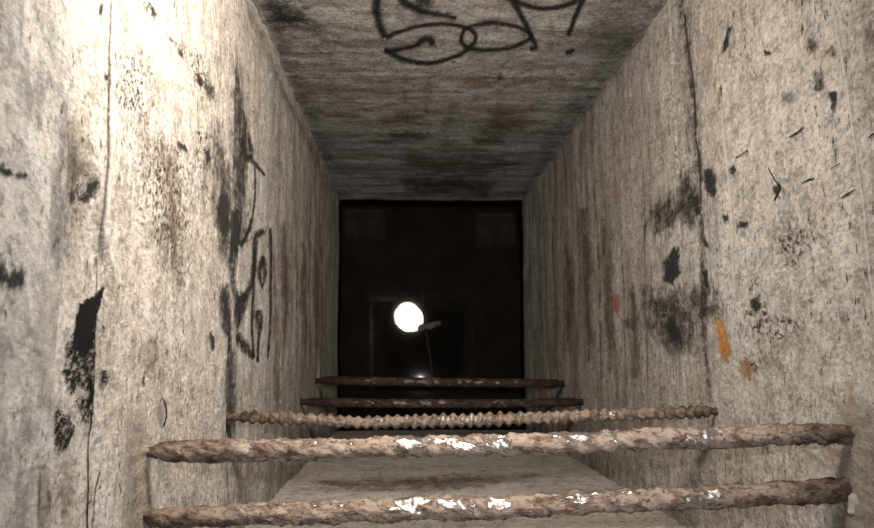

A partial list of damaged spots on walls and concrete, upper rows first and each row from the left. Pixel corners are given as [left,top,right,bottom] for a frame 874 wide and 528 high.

corrosion [713,318,730,360]
corrosion [739,357,754,381]
crack [87,287,101,528]